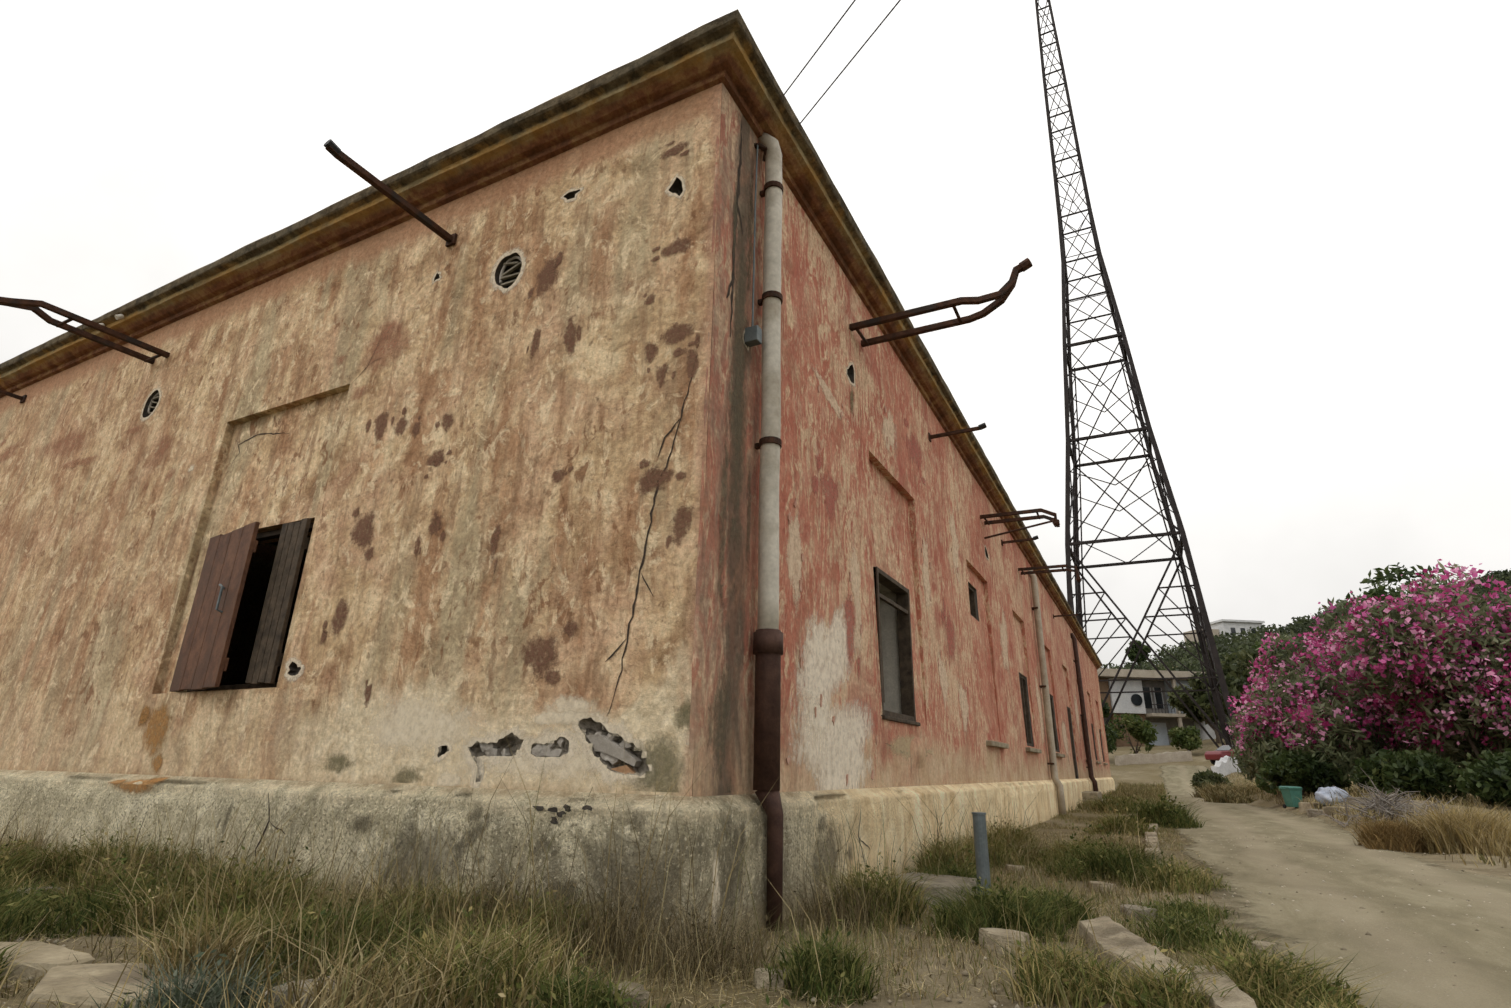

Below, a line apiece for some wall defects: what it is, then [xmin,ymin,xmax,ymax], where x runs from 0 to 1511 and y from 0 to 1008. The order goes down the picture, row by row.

flaking render [665,174,686,198]
water stain [365,407,454,440]
water stain [424,450,452,479]
water stain [639,460,686,494]
water stain [350,508,374,560]
crack [605,379,692,715]
water stain [666,506,693,548]
peeling [787,498,804,606]
water stain [320,599,348,644]
peeling [786,547,877,791]
flaking render [433,711,658,788]
peeling [533,804,592,856]